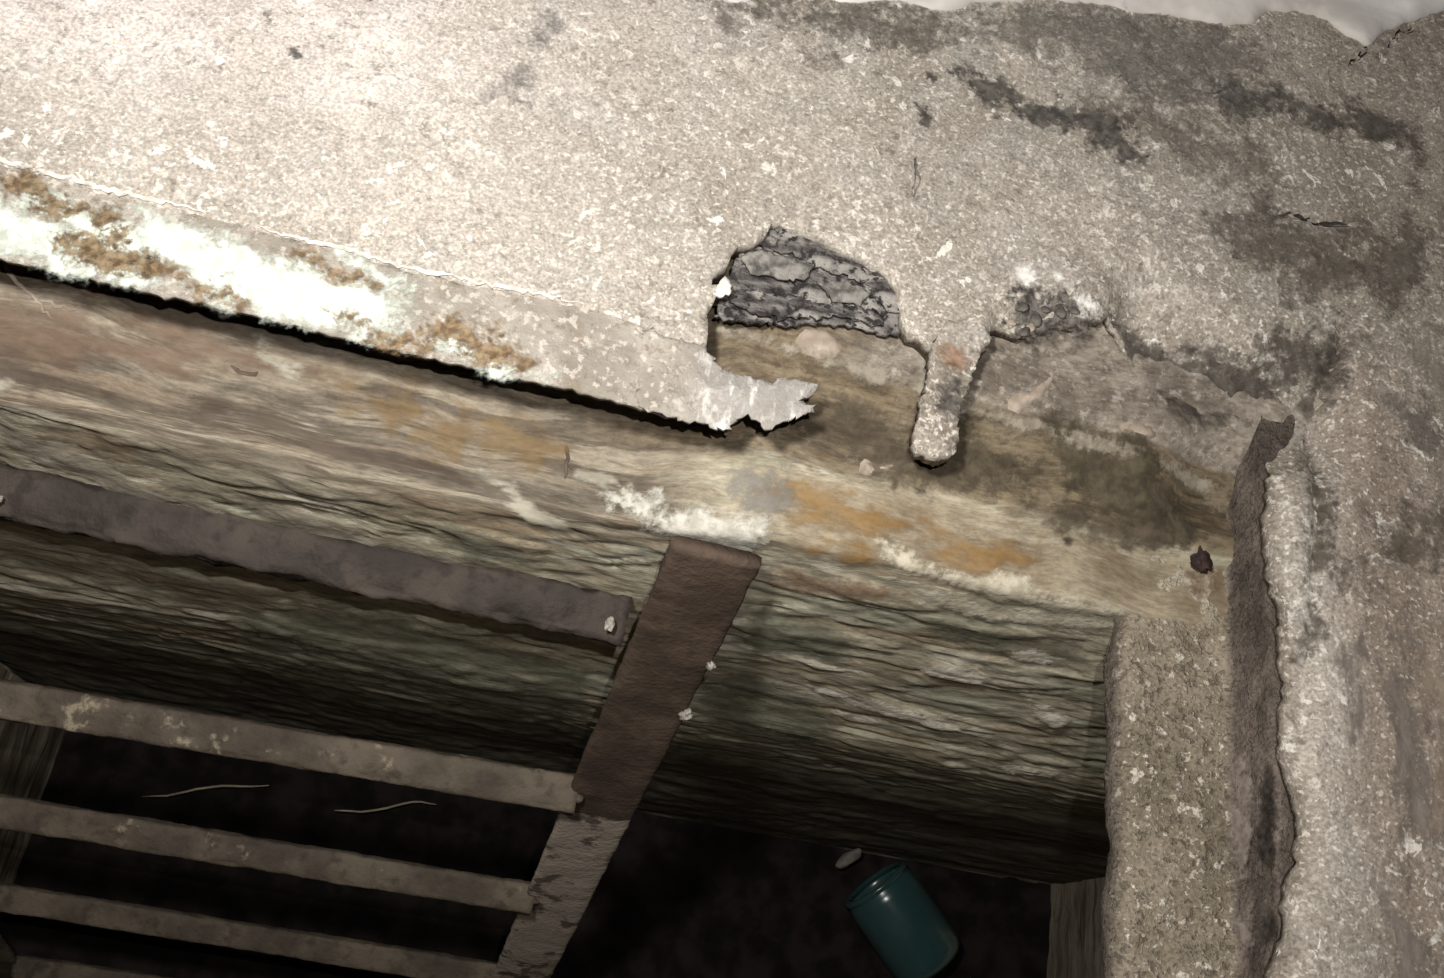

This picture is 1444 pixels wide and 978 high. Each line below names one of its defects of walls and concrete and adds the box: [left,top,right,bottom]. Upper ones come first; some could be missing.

water stain [948,63,1149,163]
water stain [1212,78,1423,167]
peeling [712,276,732,299]
spalling [1001,265,1103,344]
water stain [1204,195,1424,318]
water stain [0,361,31,390]
water stain [258,337,301,380]
water stain [2,431,221,515]
water stain [239,414,463,481]
water stain [235,495,496,571]
water stain [479,469,569,530]